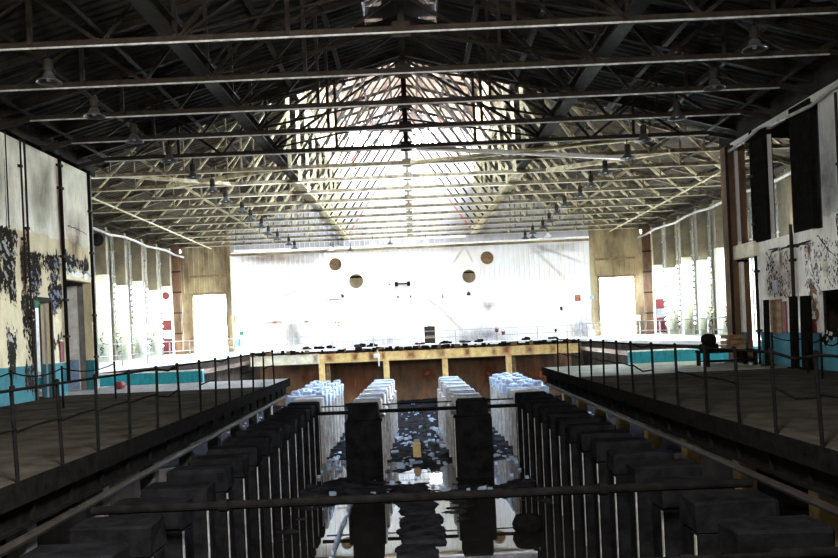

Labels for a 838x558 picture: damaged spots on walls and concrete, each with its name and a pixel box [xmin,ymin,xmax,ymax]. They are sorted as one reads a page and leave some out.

peeling [0,225,91,397]
peeling [766,213,838,324]
spalling [822,330,835,347]